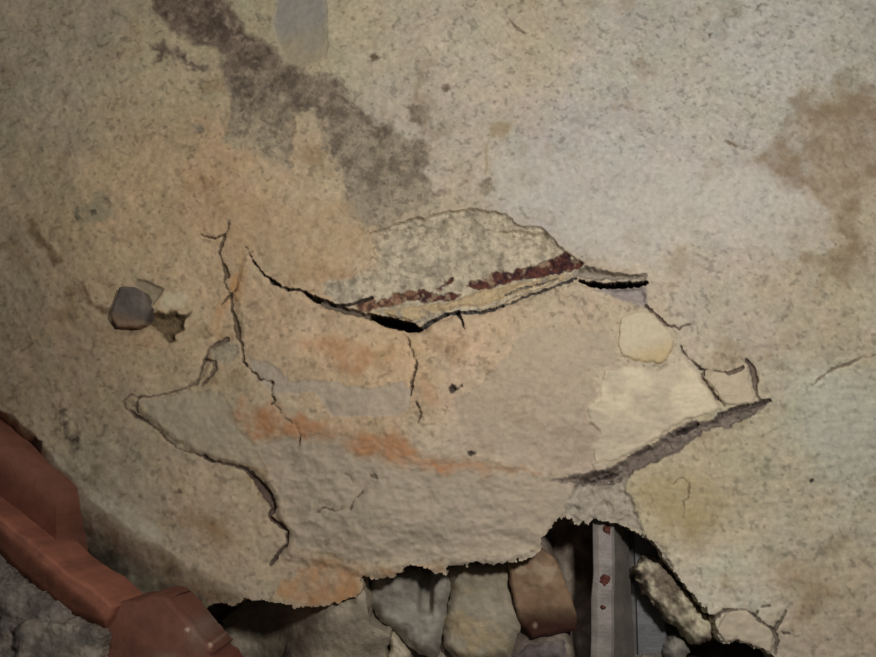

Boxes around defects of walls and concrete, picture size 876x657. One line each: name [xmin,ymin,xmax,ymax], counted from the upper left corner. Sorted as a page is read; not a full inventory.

spalling [135,278,192,344]
crack [123,219,772,566]
peeling [148,0,756,464]
corrosion [354,251,585,312]
damp [748,63,876,291]
crack [811,354,876,386]
spalling [563,478,775,654]